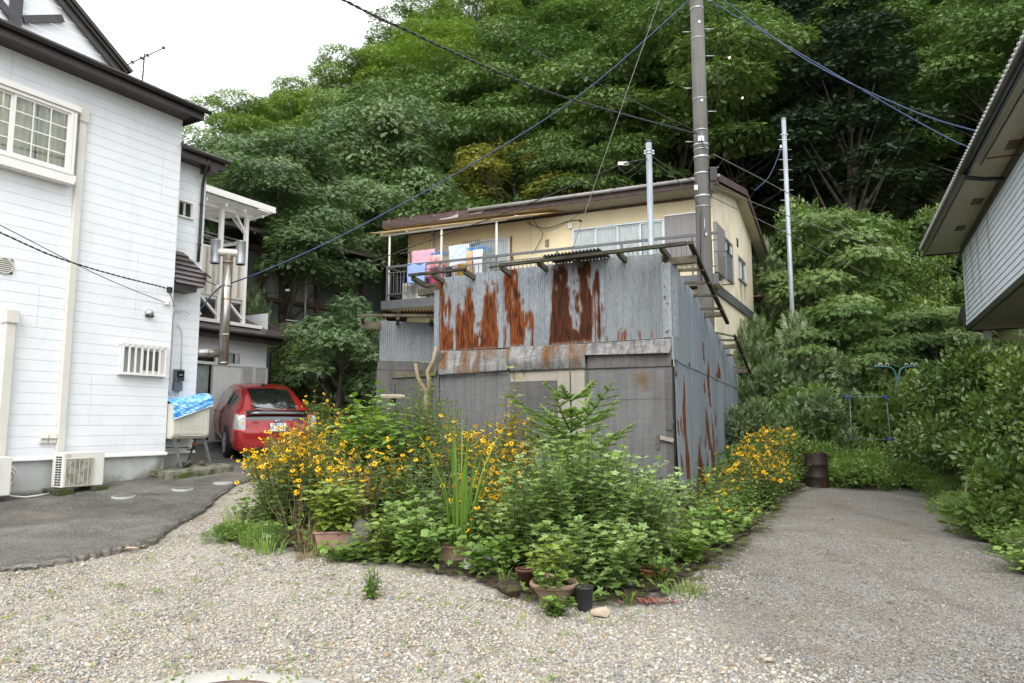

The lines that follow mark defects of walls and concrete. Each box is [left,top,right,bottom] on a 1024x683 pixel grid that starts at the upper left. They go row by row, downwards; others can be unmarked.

rust [440,237,653,373]
rust [675,343,721,506]